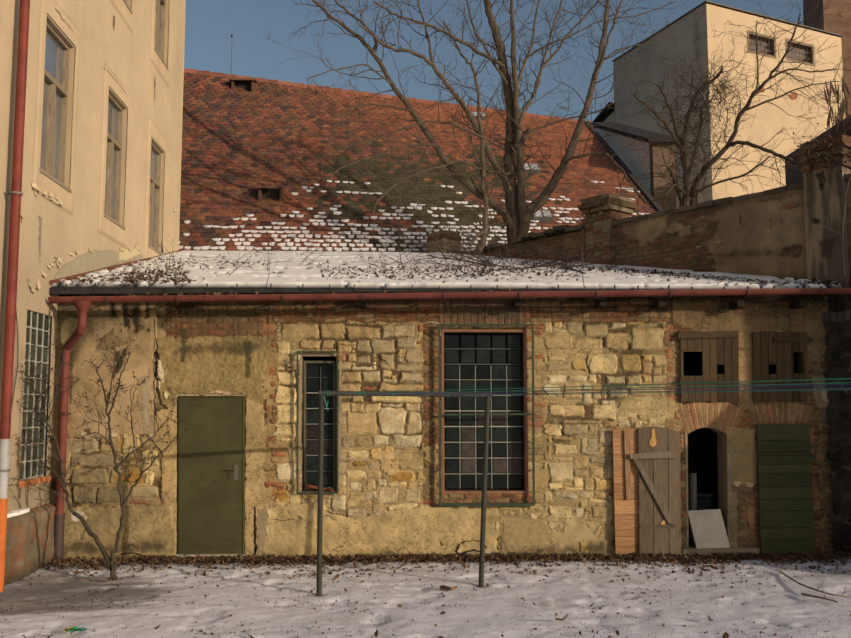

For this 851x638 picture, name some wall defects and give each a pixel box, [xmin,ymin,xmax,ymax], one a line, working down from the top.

peeling [119,245,140,261]
peeling [157,359,169,399]